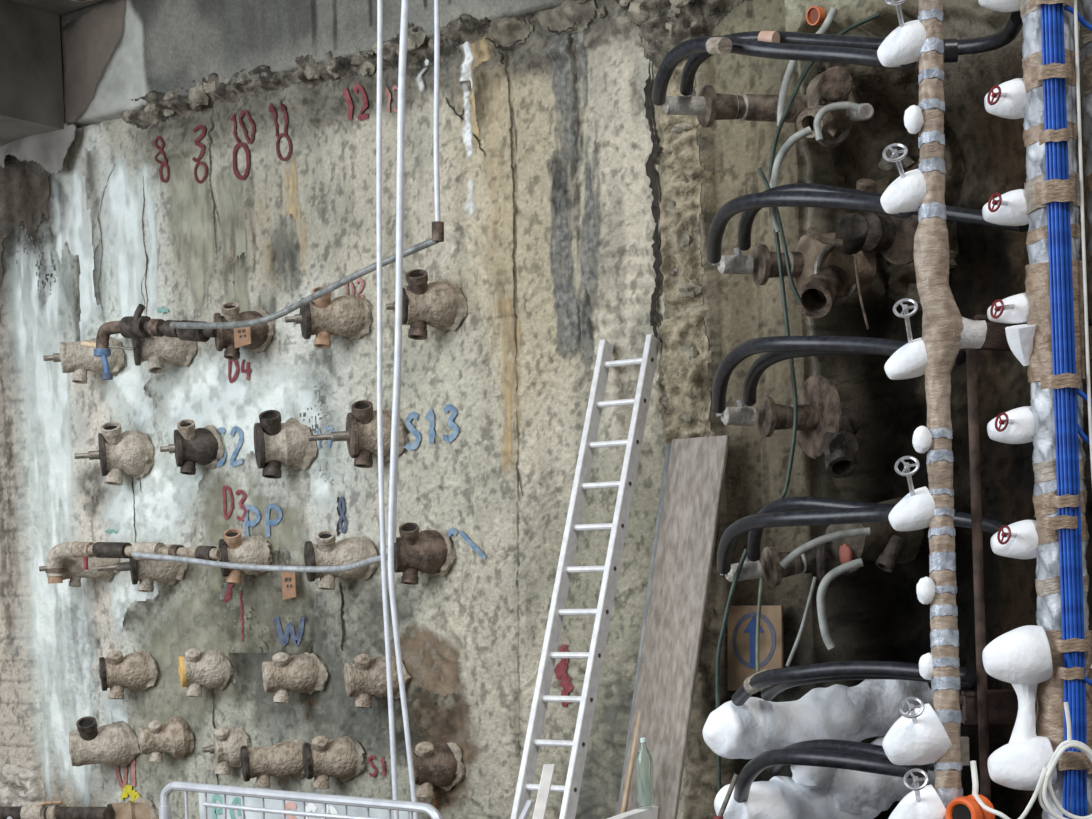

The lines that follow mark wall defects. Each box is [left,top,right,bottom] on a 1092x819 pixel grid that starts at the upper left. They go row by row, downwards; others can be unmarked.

peeling [0,161,55,298]
water stain [11,149,477,803]
spalling [121,13,491,129]
crack [446,13,575,751]
water stain [547,30,599,367]
crack [643,58,662,342]